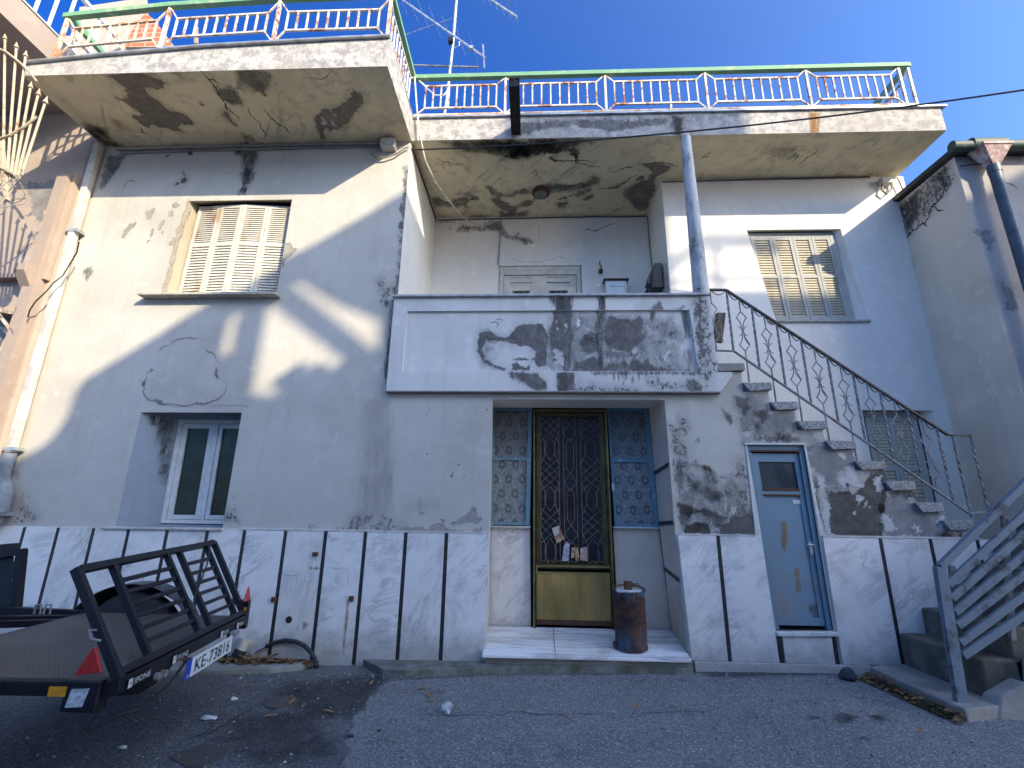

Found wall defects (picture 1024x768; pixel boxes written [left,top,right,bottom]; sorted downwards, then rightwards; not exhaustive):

flaking render [109,73,193,132]
crack [200,70,318,164]
flaking render [314,90,363,139]
rust [809,113,820,132]
damp [237,138,257,192]
damp [549,176,600,196]
damp [899,166,954,239]
flaking render [478,324,548,371]
flaking render [580,316,679,368]
damp [722,396,797,443]
damp [673,459,746,529]
flaking render [802,444,962,537]